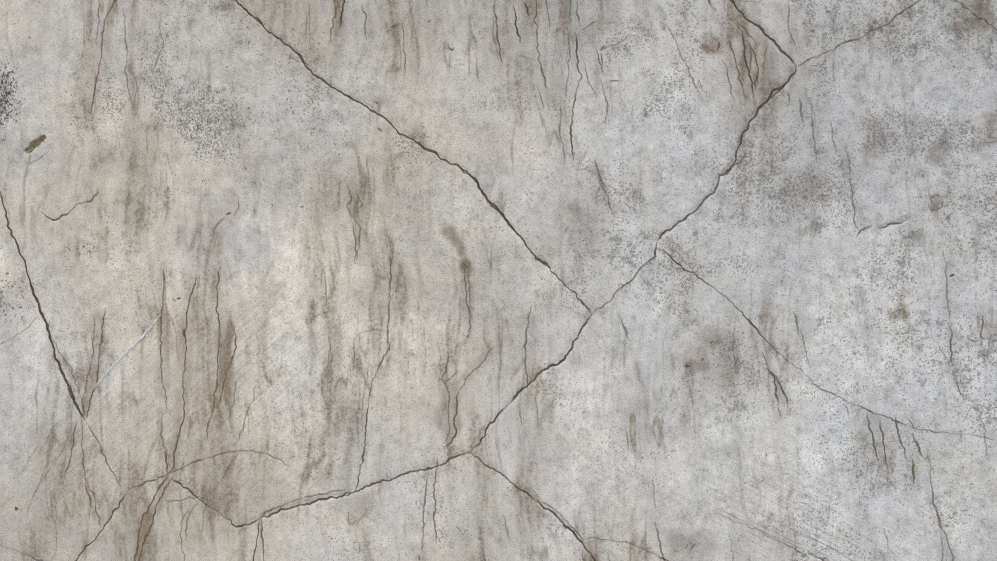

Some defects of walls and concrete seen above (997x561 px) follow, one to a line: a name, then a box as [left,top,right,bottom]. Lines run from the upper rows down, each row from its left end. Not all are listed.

leakage [0,56,22,125]
crack [622,0,917,287]
crack [0,192,82,416]
crack [231,0,596,561]
crack [75,459,211,561]